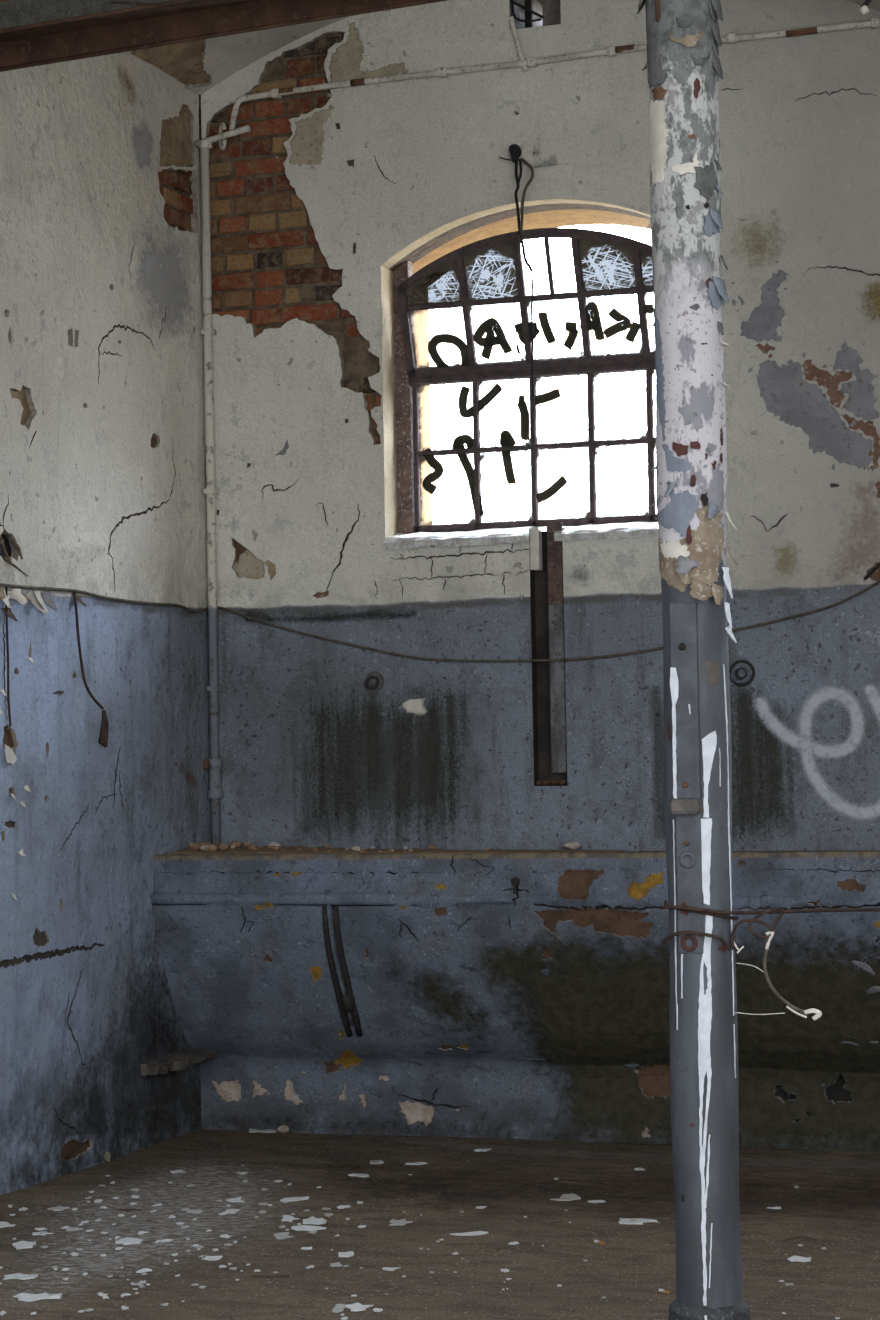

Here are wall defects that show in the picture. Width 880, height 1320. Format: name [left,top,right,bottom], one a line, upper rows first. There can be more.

spalling [130,18,409,445]
spalling [10,385,37,430]
crack [98,306,167,383]
spalling [151,433,160,448]
peeling [718,255,880,498]
peeling [0,528,58,621]
crack [108,453,176,587]
crack [262,480,360,590]
water stain [319,701,454,834]
peeling [533,869,664,977]
crack [0,943,104,1068]
spalling [398,1100,434,1127]